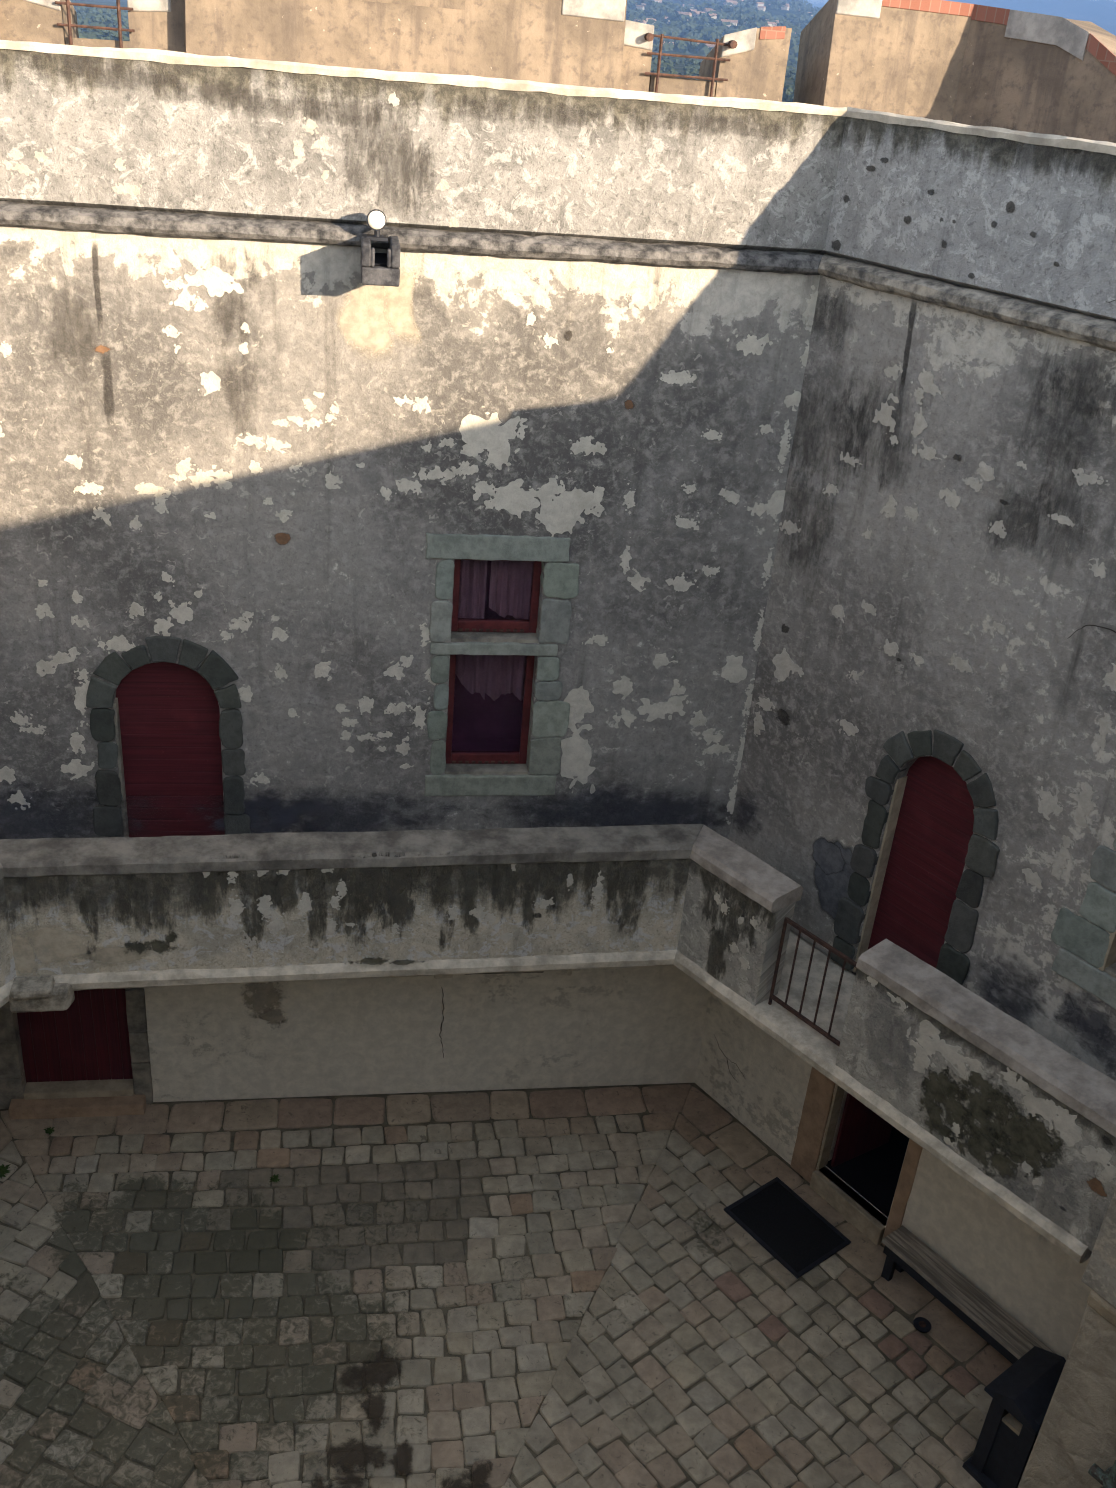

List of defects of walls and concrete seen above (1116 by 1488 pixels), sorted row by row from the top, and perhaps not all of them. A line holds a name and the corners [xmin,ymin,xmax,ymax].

leakage [92,247,102,320]
peeling [162,265,244,312]
peeling [64,454,111,526]
peeling [129,391,339,532]
peeling [377,406,607,537]
crack [1067,625,1116,639]
peeling [336,619,438,769]
peeling [612,607,804,825]
leakage [244,791,452,833]
leakage [513,787,759,831]
leakage [17,856,647,956]
leakage [700,869,776,979]